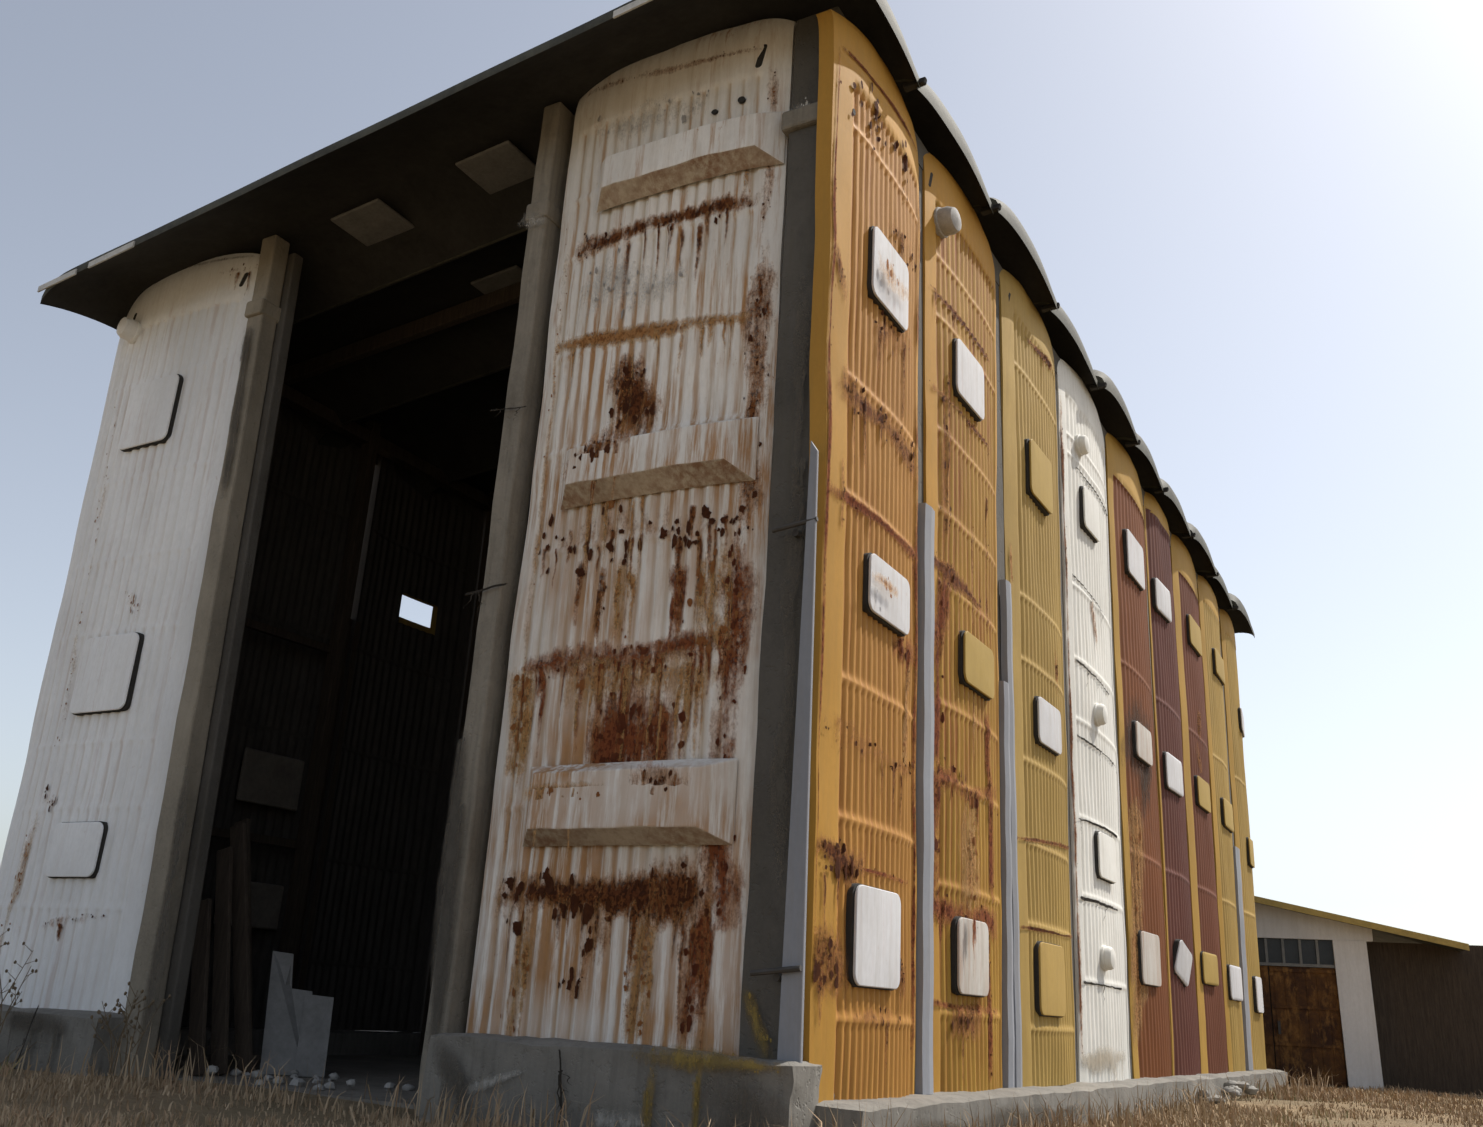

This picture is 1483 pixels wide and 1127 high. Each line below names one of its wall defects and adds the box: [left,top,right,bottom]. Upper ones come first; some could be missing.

rust [566,166,773,308]
rust [507,267,775,800]
rust [813,48,998,1079]
rust [494,835,741,1047]